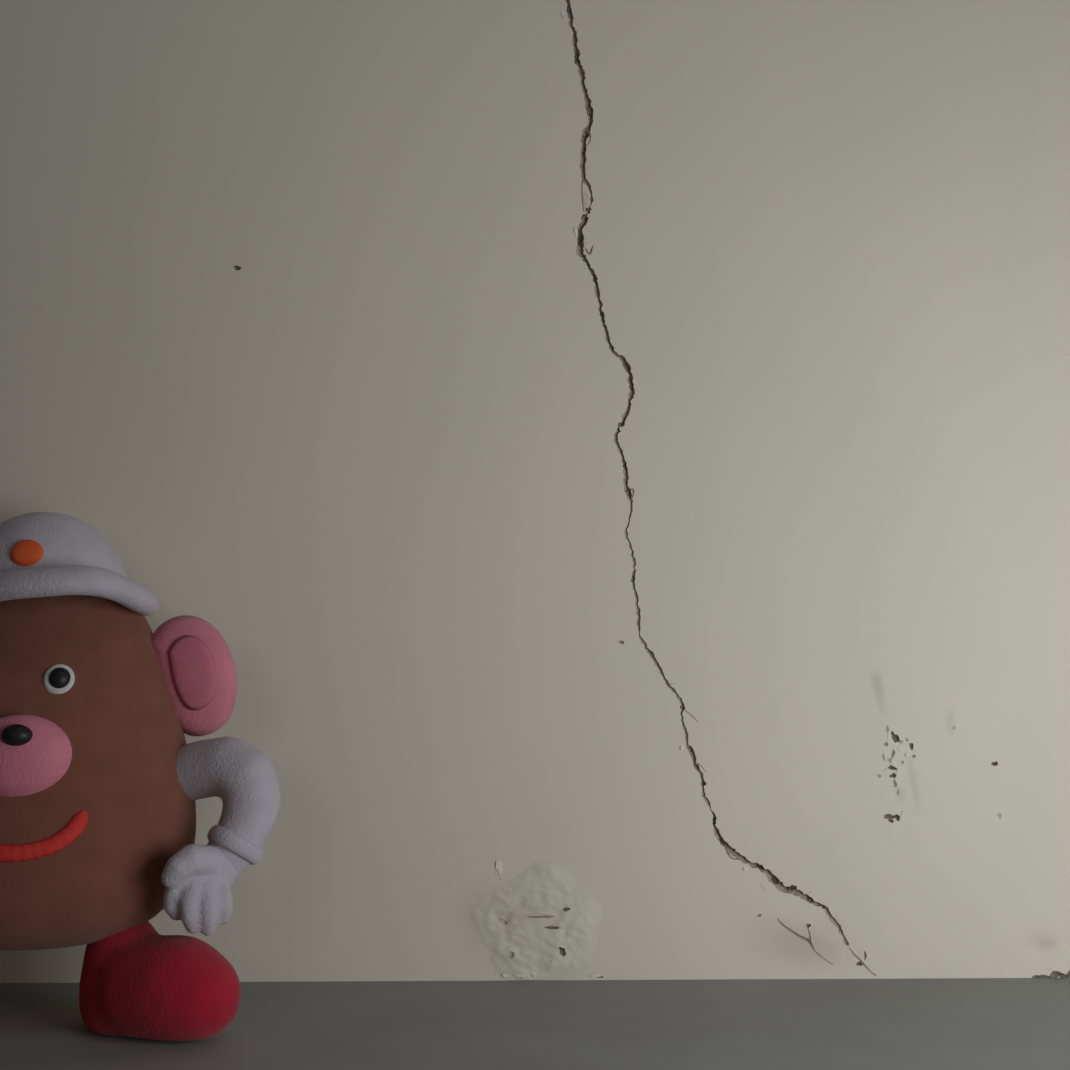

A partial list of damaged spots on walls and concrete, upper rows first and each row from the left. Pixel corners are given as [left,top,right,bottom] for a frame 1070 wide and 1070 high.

crack [561,0,876,976]
peeling [467,860,603,980]
flaking render [1033,968,1070,978]